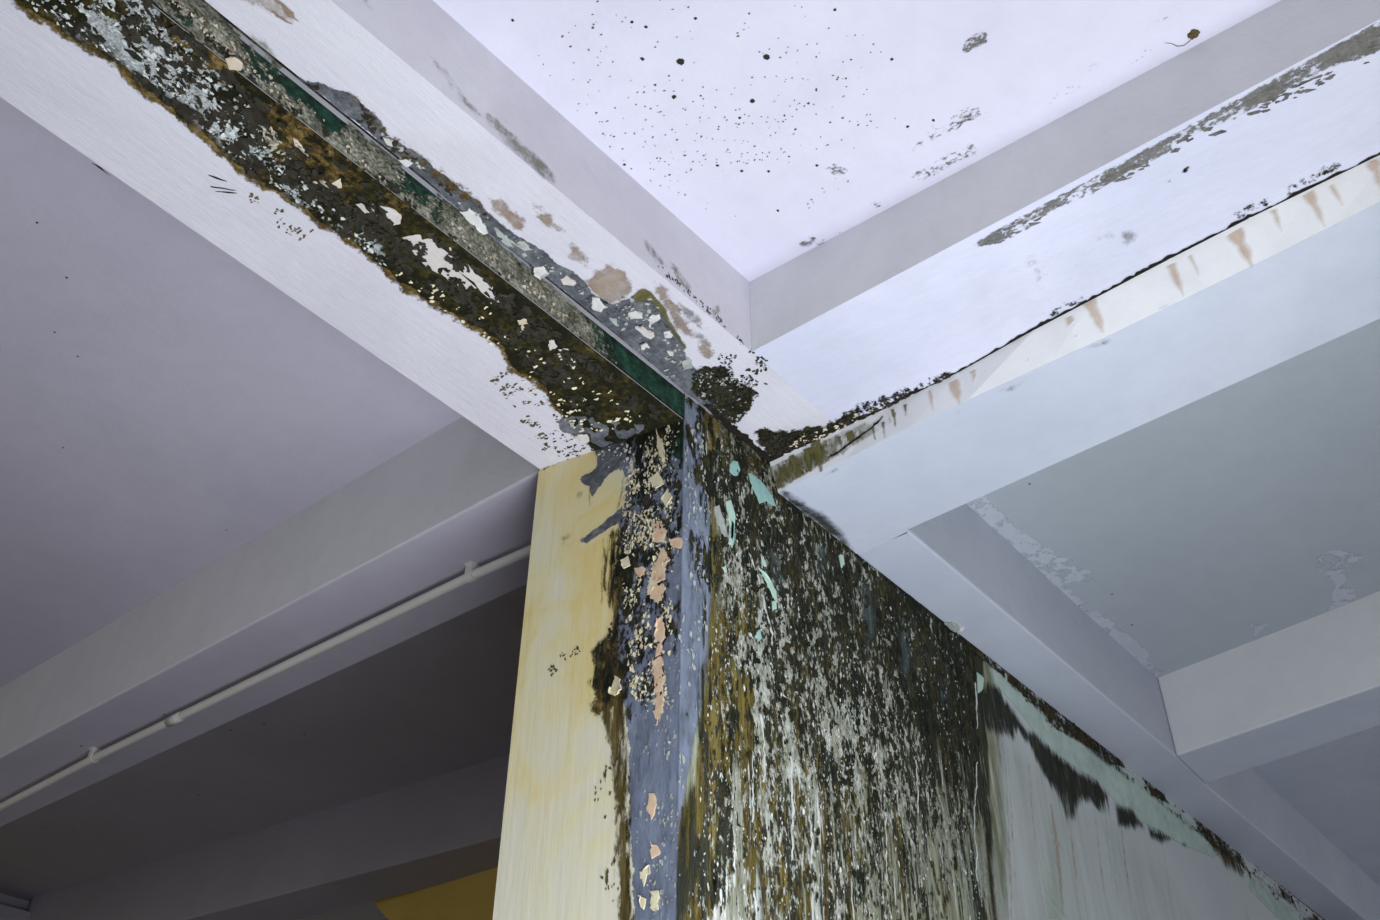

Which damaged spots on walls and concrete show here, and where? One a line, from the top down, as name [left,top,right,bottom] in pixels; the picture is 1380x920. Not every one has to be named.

peeling [172,0,294,109]
water stain [595,38,878,196]
water stain [653,251,725,336]
corrosion [1229,228,1247,256]
water stain [15,0,687,920]
peeling [297,76,720,920]
corrosion [771,404,907,489]
water stain [676,351,1125,920]
water stain [1116,807,1141,829]
water stain [1143,779,1325,920]